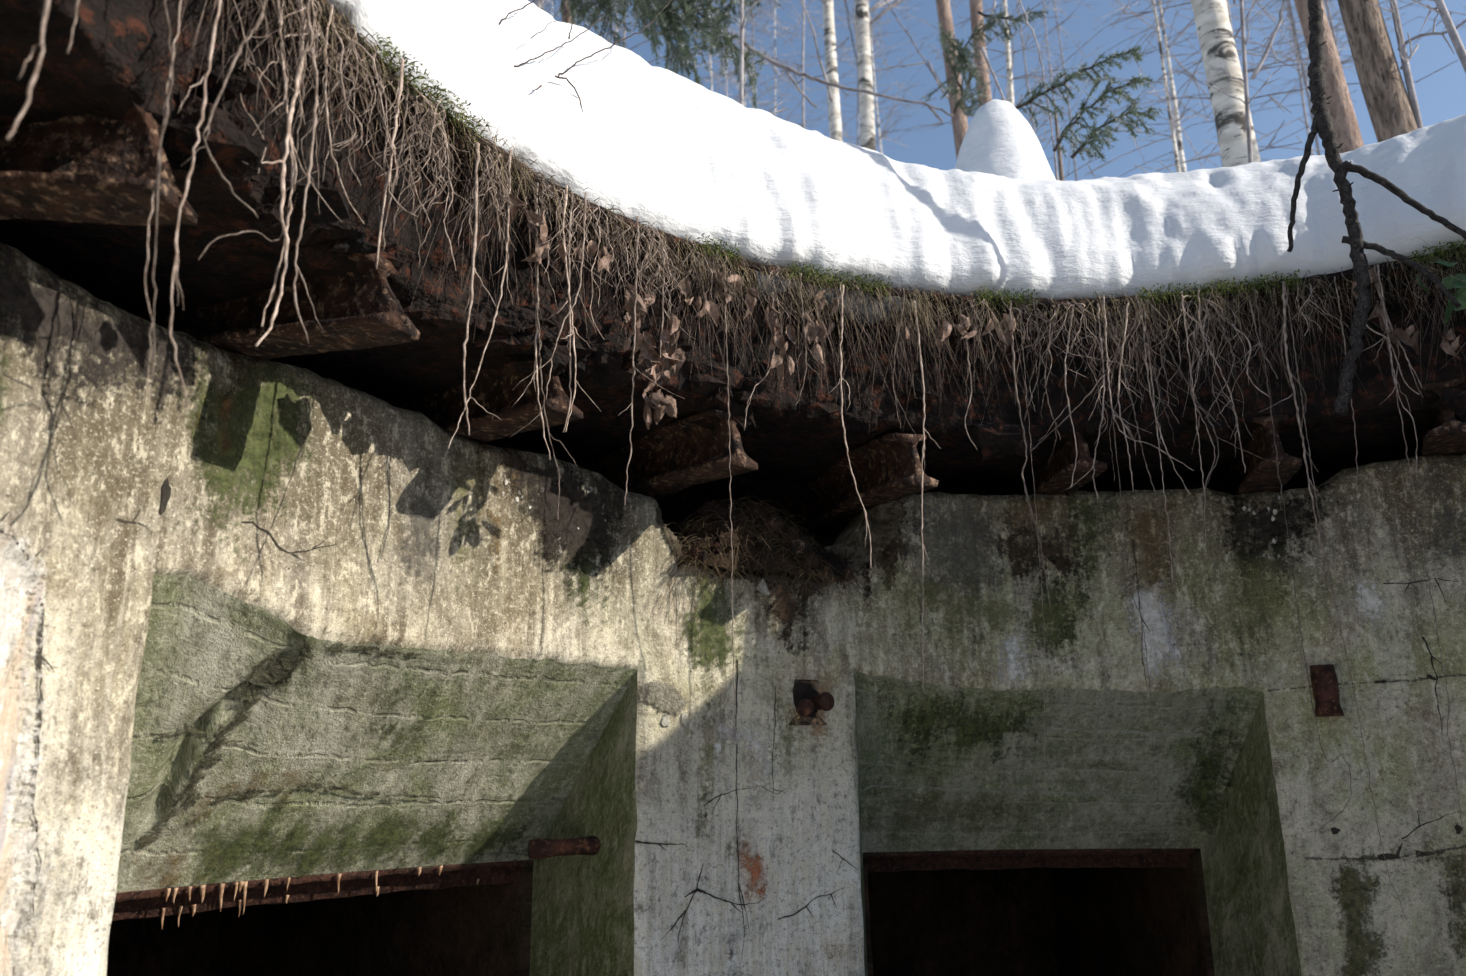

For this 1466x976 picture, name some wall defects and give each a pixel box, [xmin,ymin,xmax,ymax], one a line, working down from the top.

damp [475,447,640,606]
damp [688,619,732,690]
damp [741,570,824,657]
damp [838,495,1097,663]
crack [1383,578,1459,605]
crack [1422,637,1442,730]
crack [139,640,440,848]
crack [635,661,857,955]
corrosion [739,843,767,898]
crack [1402,811,1456,839]